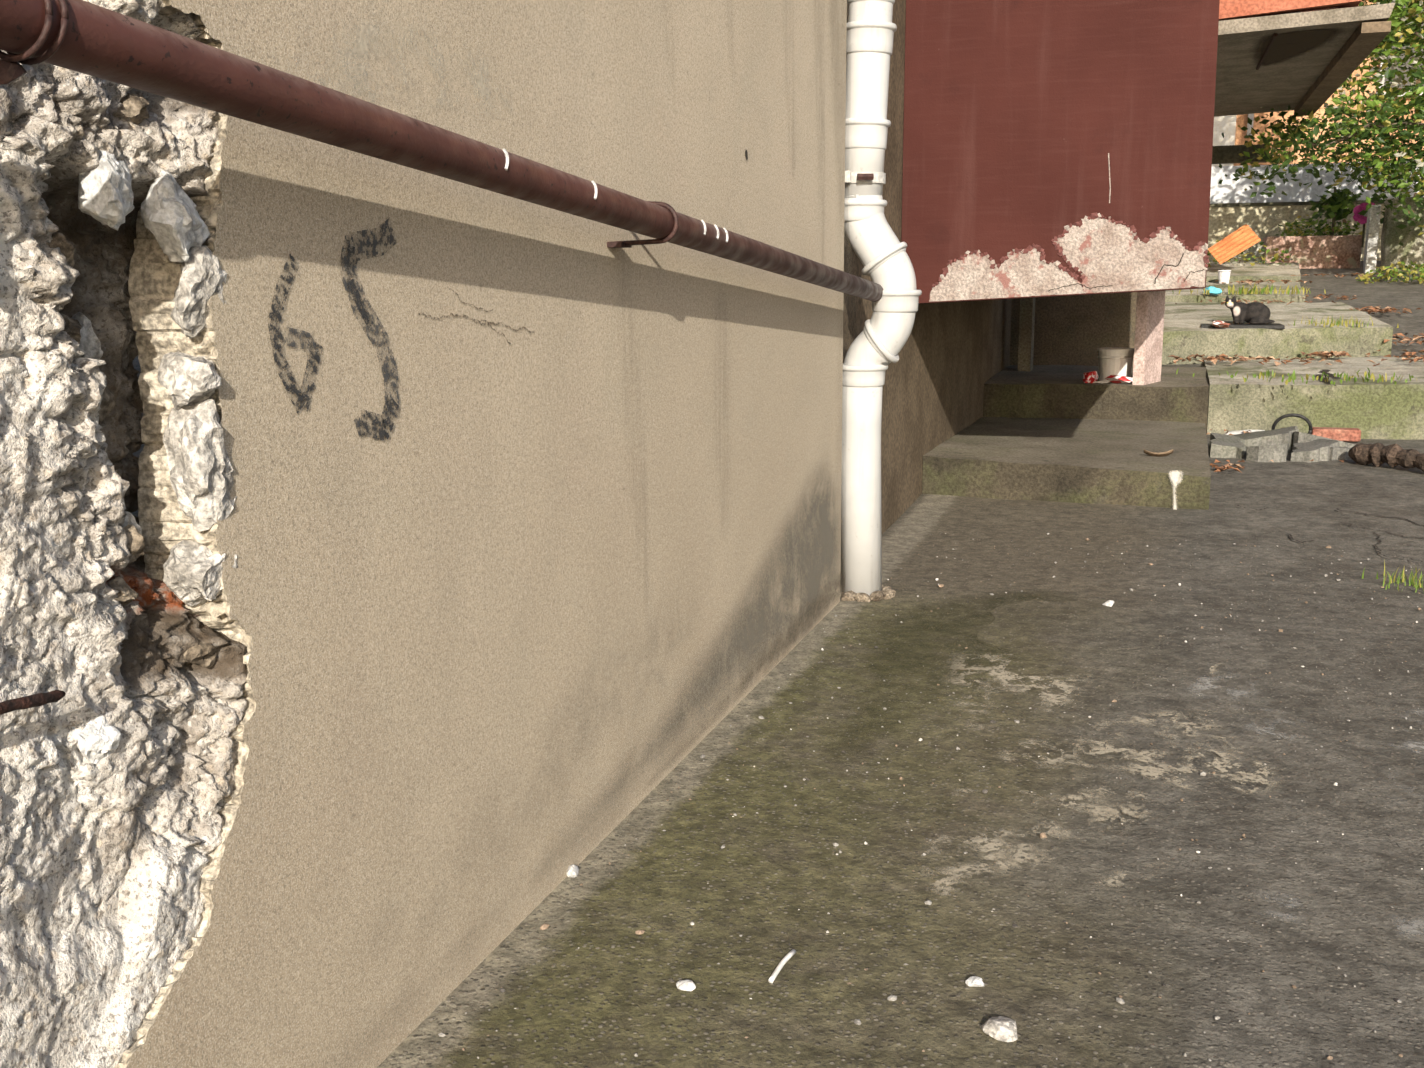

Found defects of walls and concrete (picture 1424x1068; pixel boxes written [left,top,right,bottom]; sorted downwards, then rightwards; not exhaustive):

spalling [84,0,223,50]
peeling [929,212,1209,302]
spalling [0,50,256,1068]